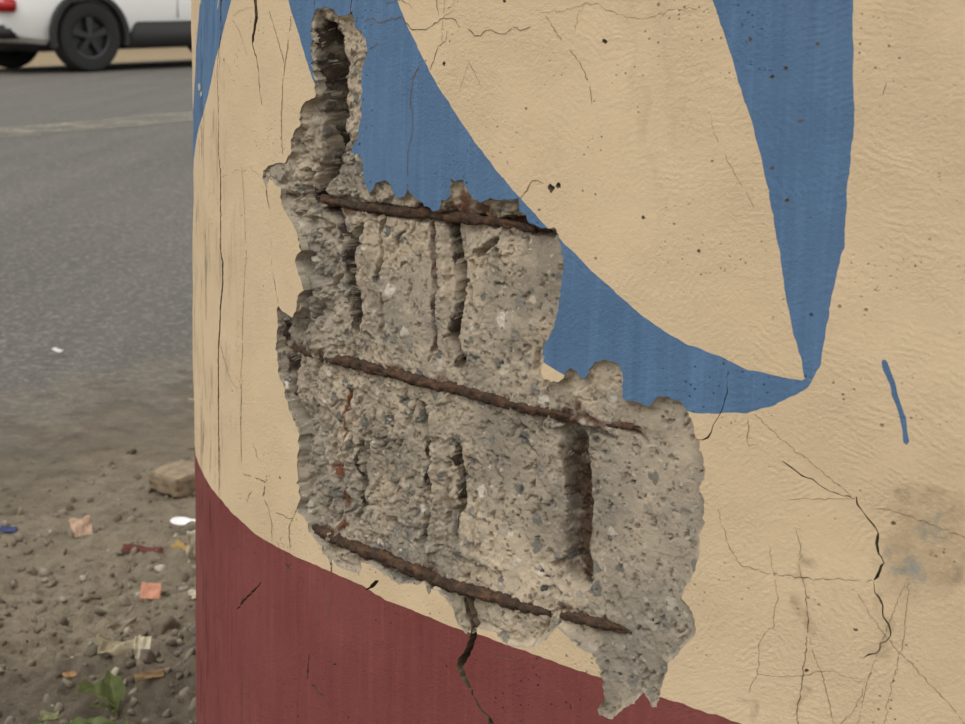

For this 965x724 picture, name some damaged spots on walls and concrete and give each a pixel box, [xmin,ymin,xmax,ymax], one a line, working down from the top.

corrosion [431,193,493,265]
corrosion [502,215,554,235]
crack [201,0,297,542]
corrosion [283,322,302,371]
corrosion [431,302,465,351]
spalling [262,7,705,719]
corrosion [332,442,369,507]
corrosion [450,449,468,501]
corrosion [554,402,606,579]
crack [718,415,965,724]
crack [457,596,494,724]